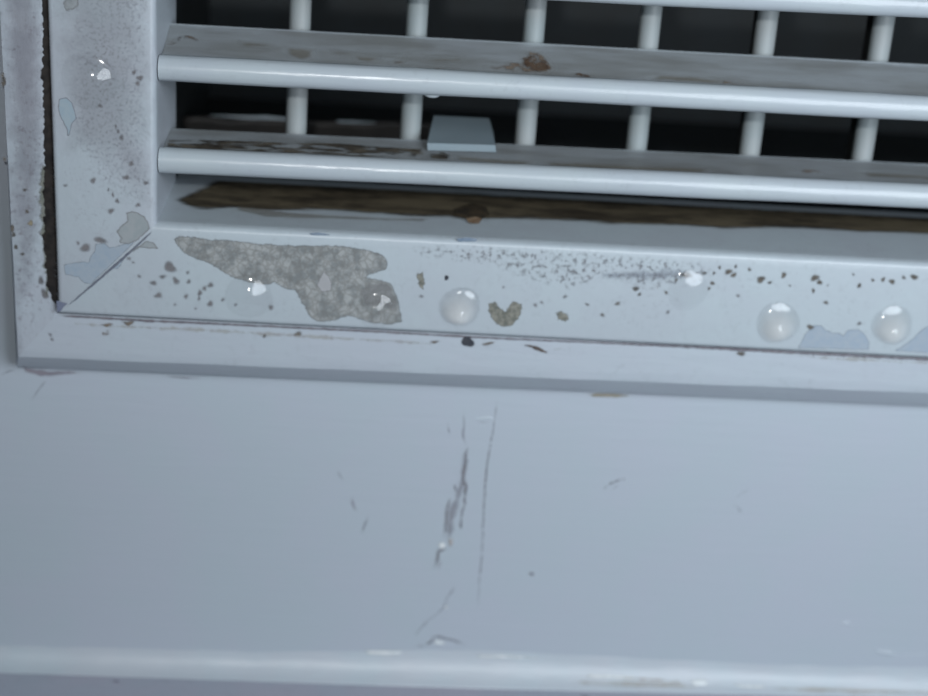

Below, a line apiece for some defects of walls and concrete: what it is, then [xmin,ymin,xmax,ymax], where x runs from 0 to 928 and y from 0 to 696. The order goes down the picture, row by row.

rust [497,52,551,72]
peeling [64,211,158,284]
peeling [174,232,402,325]
peeling [488,302,522,327]
peeling [798,325,869,350]
crack [436,413,496,580]